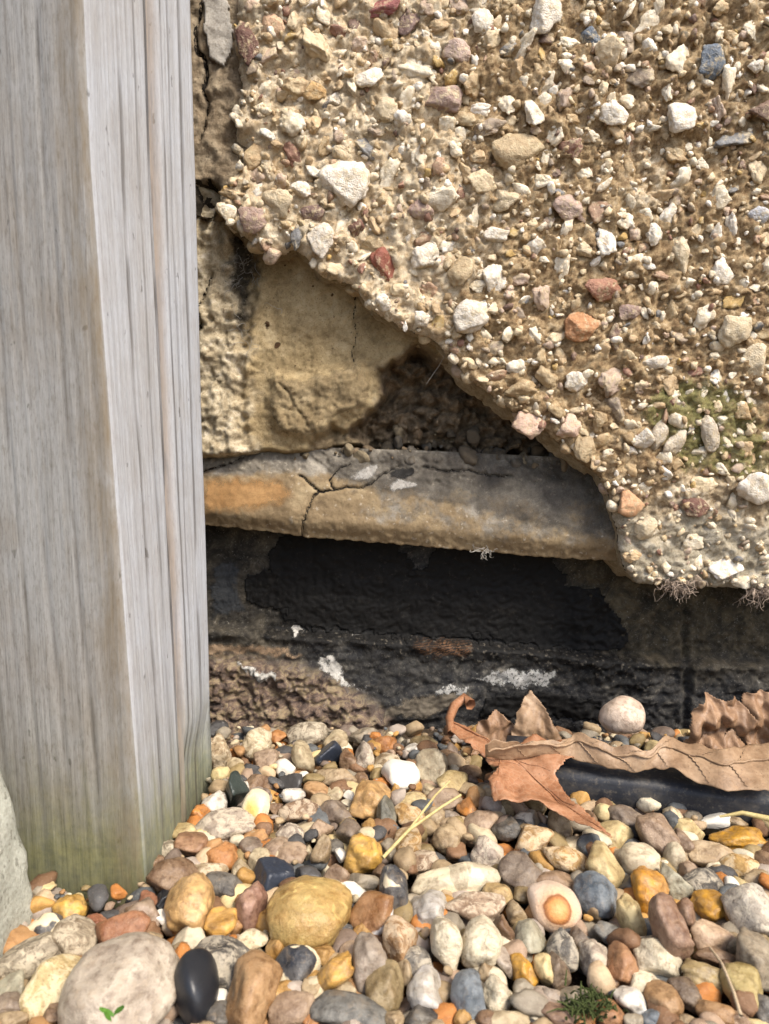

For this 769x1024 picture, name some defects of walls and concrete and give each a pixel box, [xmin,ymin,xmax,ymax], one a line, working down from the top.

crack [193,0,210,136]
spalling [229,105,244,123]
spalling [196,187,635,582]
crack [299,463,398,536]
efflorescence [237,662,276,683]
efflorescence [319,655,355,686]
leakage [383,668,555,718]